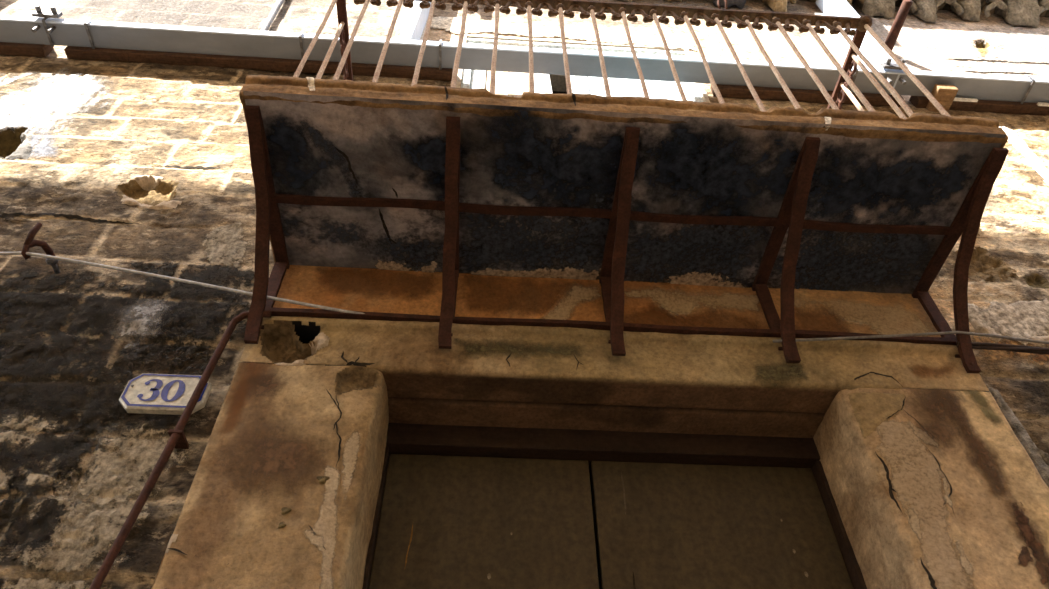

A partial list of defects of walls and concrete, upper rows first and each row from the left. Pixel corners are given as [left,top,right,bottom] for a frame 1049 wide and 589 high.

spalling [0,127,34,160]
spalling [115,175,182,210]
spalling [260,320,330,366]
crack [341,351,375,366]
crack [326,389,342,466]
crack [854,372,954,514]
water stain [919,389,1049,587]
crack [920,557,937,589]